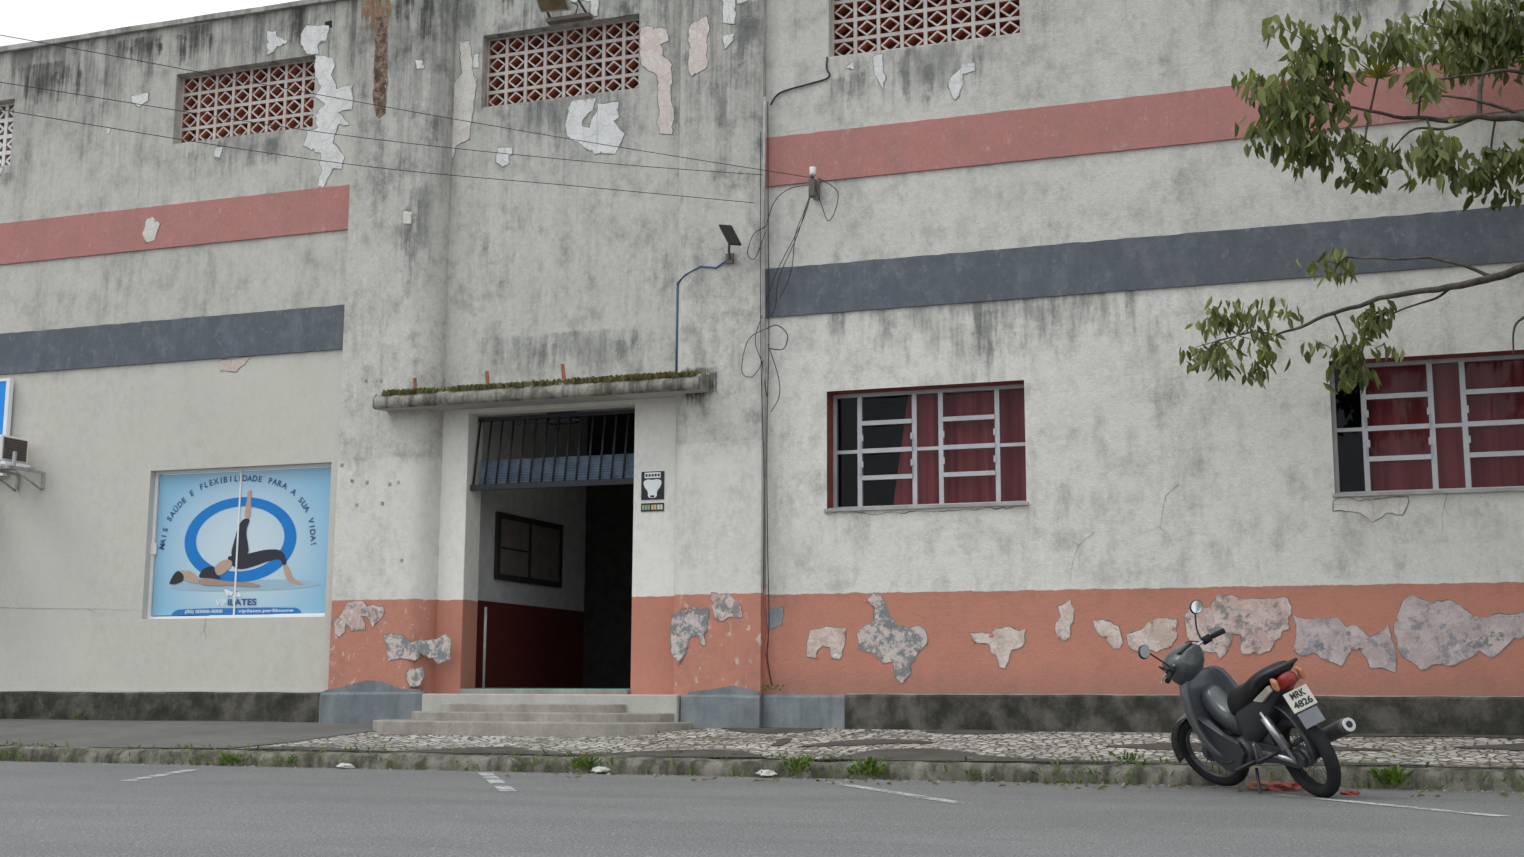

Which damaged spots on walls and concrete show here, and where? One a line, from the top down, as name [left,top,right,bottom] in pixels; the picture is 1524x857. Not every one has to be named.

peeling [266,24,354,188]
flaking render [373,16,389,118]
peeling [564,97,626,155]
peeling [639,0,748,135]
peeling [332,600,452,687]
peeling [670,592,742,664]
peeling [765,606,784,630]
peeling [806,592,928,684]
peeling [968,626,1026,668]
peeling [1055,598,1075,642]
peeling [1093,594,1524,673]